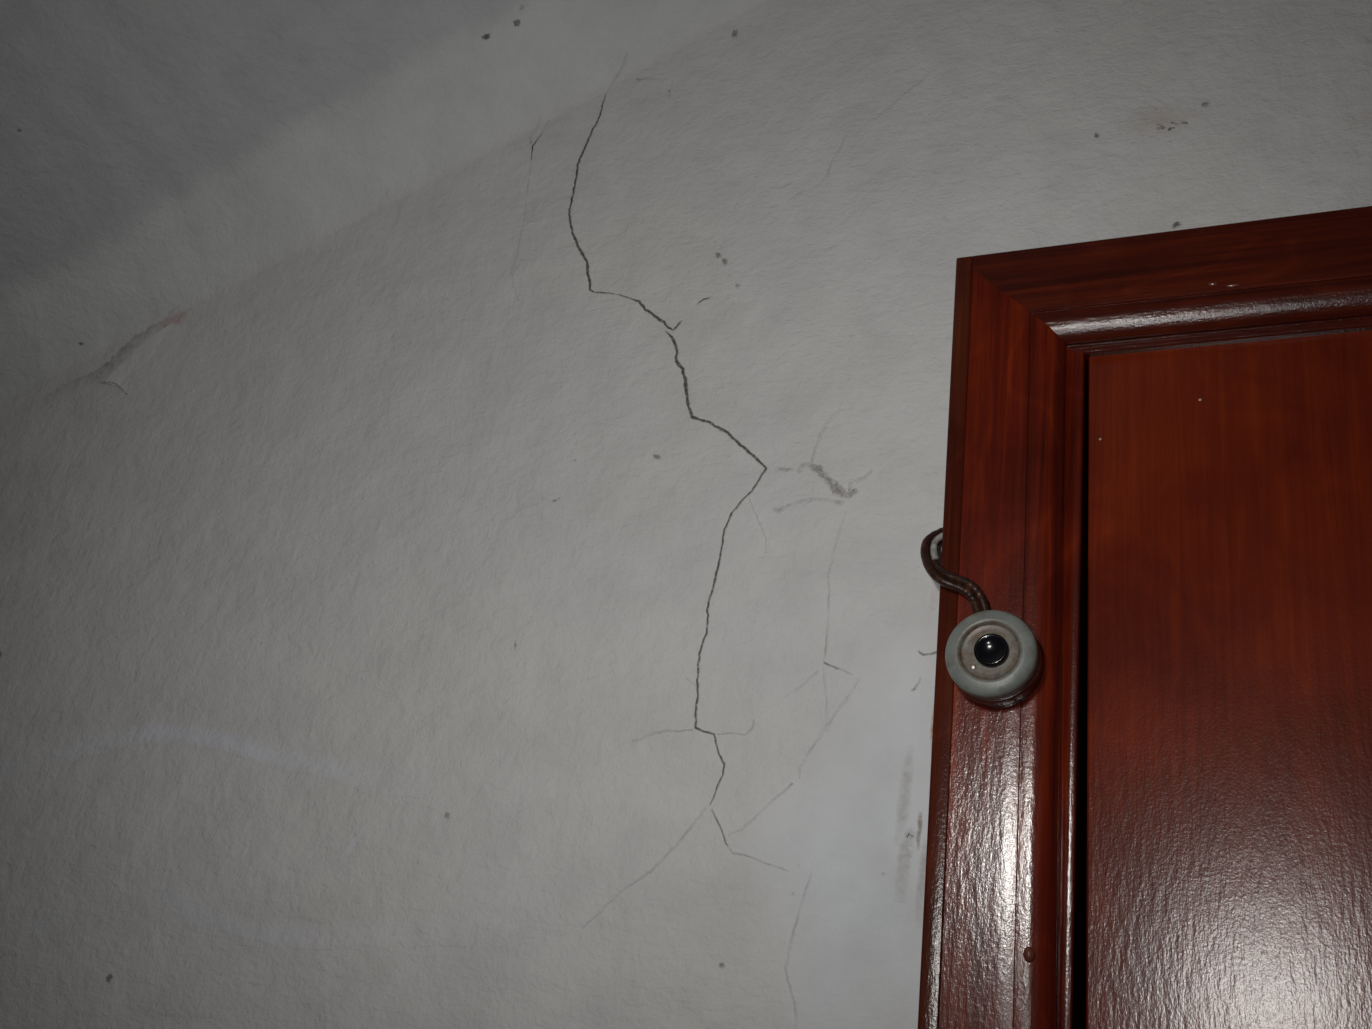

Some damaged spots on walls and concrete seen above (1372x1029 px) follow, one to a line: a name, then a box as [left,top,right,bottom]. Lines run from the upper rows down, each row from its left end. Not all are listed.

crack [568,52,860,1029]